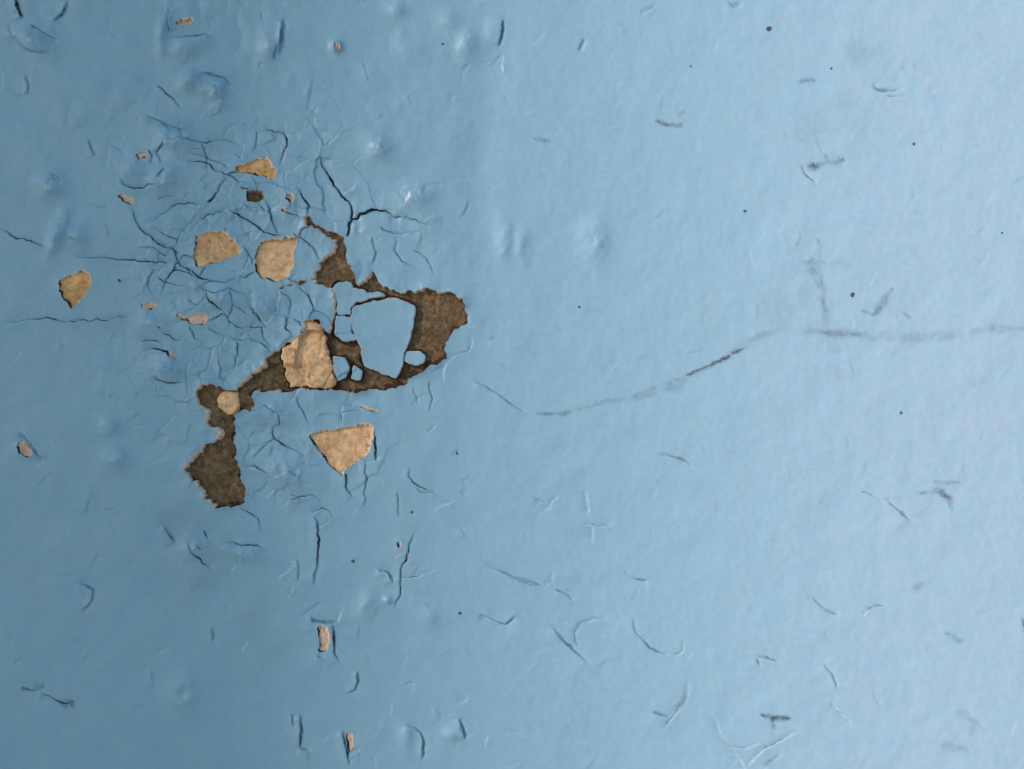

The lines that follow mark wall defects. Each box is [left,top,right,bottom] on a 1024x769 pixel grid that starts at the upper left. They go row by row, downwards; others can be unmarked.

peeling [235,156,277,180]
crack [320,156,432,269]
crack [88,121,319,367]
peeling [58,269,91,308]
peeling [176,313,208,325]
spalling [182,215,468,509]
peeling [16,439,32,457]
crack [345,434,377,492]
peeling [317,625,330,652]
peeling [346,733,354,752]